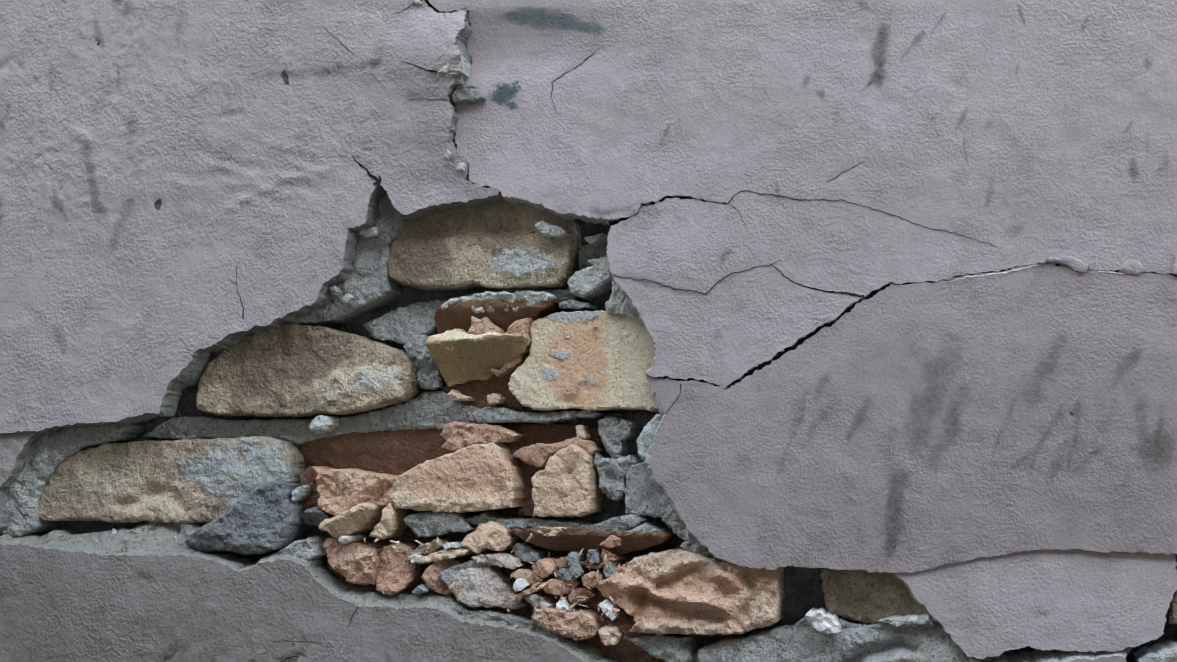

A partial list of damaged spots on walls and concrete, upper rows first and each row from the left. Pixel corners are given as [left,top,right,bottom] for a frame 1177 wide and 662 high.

crack [394,0,453,14]
crack [322,25,447,101]
crack [352,155,381,186]
crack [609,161,1060,414]
flaking render [2,193,1017,662]
flaking render [1133,623,1177,662]